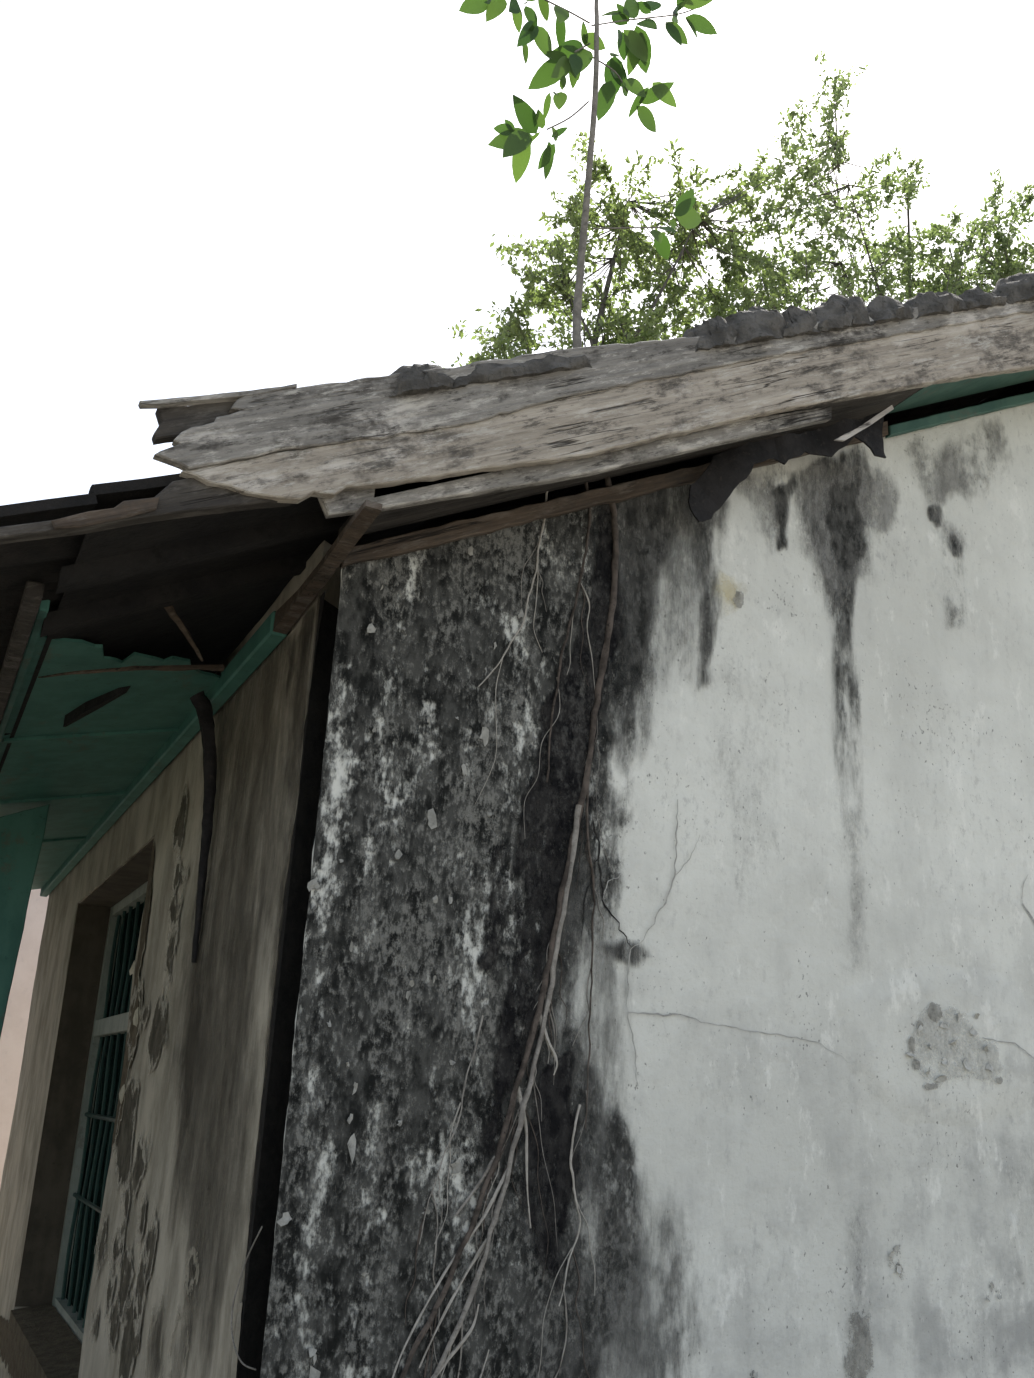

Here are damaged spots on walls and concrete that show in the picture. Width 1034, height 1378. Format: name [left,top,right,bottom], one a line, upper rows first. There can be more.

leakage [738,446,897,750]
leakage [913,425,1002,556]
peeling [90,786,188,1378]
leakage [260,483,727,1378]
crack [581,799,849,1083]
flaking render [906,1002,1004,1090]
leakage [844,1313,874,1378]